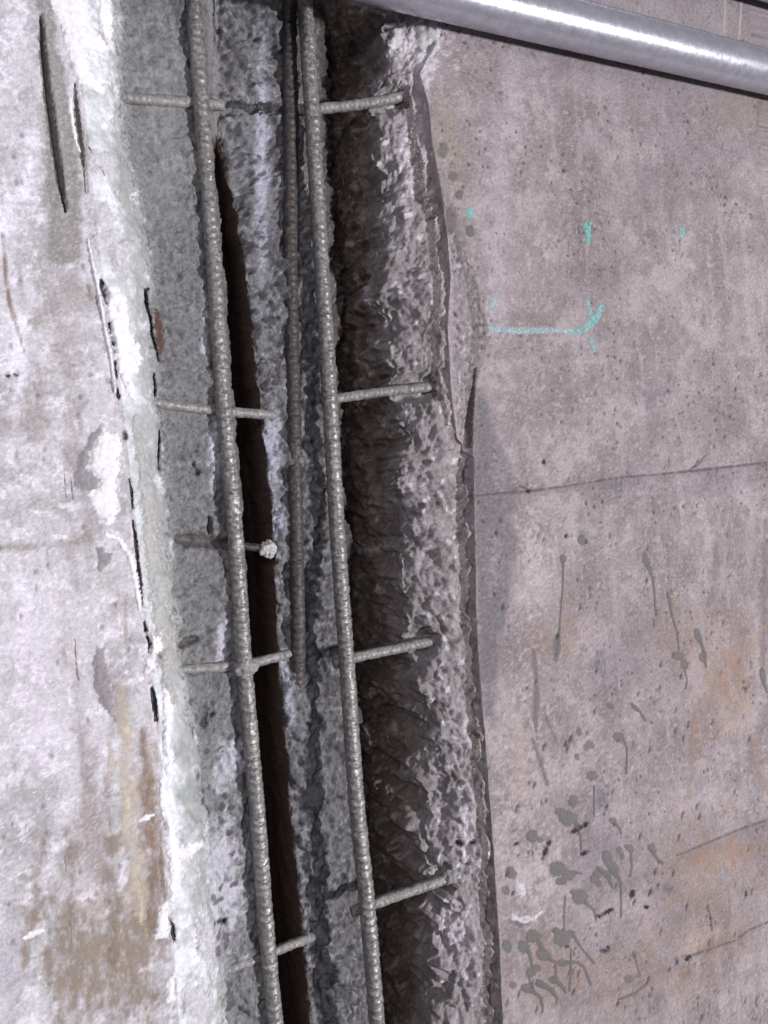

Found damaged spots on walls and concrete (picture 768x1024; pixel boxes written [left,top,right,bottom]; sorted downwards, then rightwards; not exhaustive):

crack [39,16,105,213]
crack [100,279,121,398]
crack [144,287,159,397]
crack [129,478,152,653]
crack [154,430,162,470]
spalling [51,0,267,1024]
spalling [201,0,369,1024]
spalling [313,0,543,1024]
crack [399,91,761,1024]
crack [150,687,159,722]
water stain [532,653,556,785]
crack [168,918,177,941]